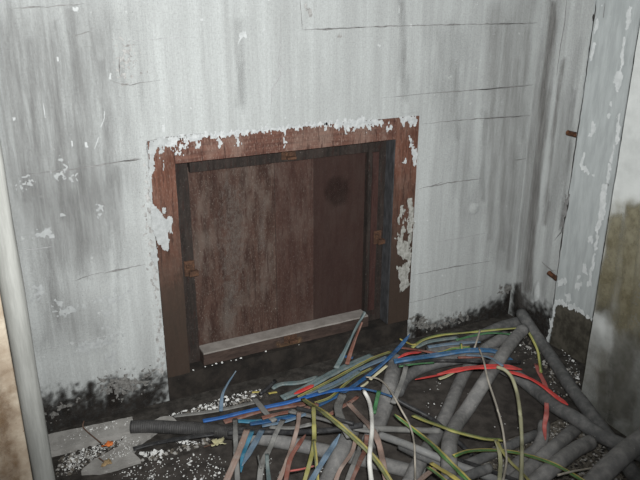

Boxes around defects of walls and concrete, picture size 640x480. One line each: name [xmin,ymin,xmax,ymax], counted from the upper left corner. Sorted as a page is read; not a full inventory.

peeling [613,6,632,92]
peeling [399,115,418,167]
peeling [31,227,54,239]
crack [75,264,145,281]
peeling [50,115,393,402]
peeling [394,198,415,292]
peeling [546,101,621,342]
damp [408,284,640,433]
spalling [45,397,80,424]
damp [42,373,169,432]